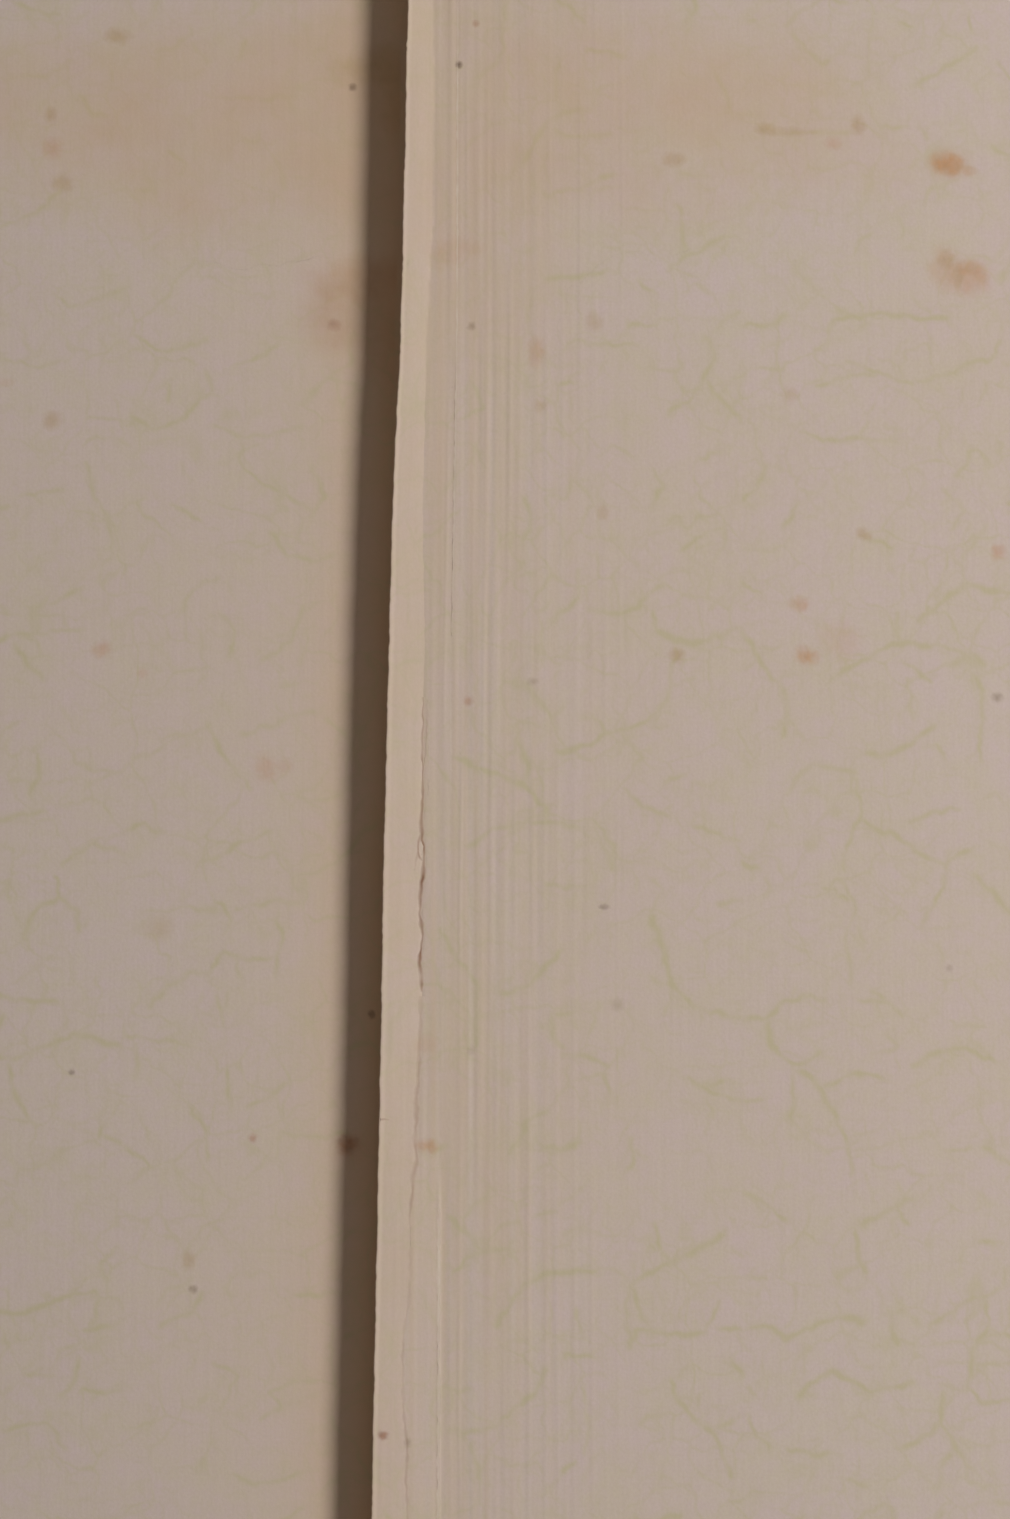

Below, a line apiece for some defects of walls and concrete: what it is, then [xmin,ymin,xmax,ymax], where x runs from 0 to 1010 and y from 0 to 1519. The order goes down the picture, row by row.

crack [400,697,428,1519]